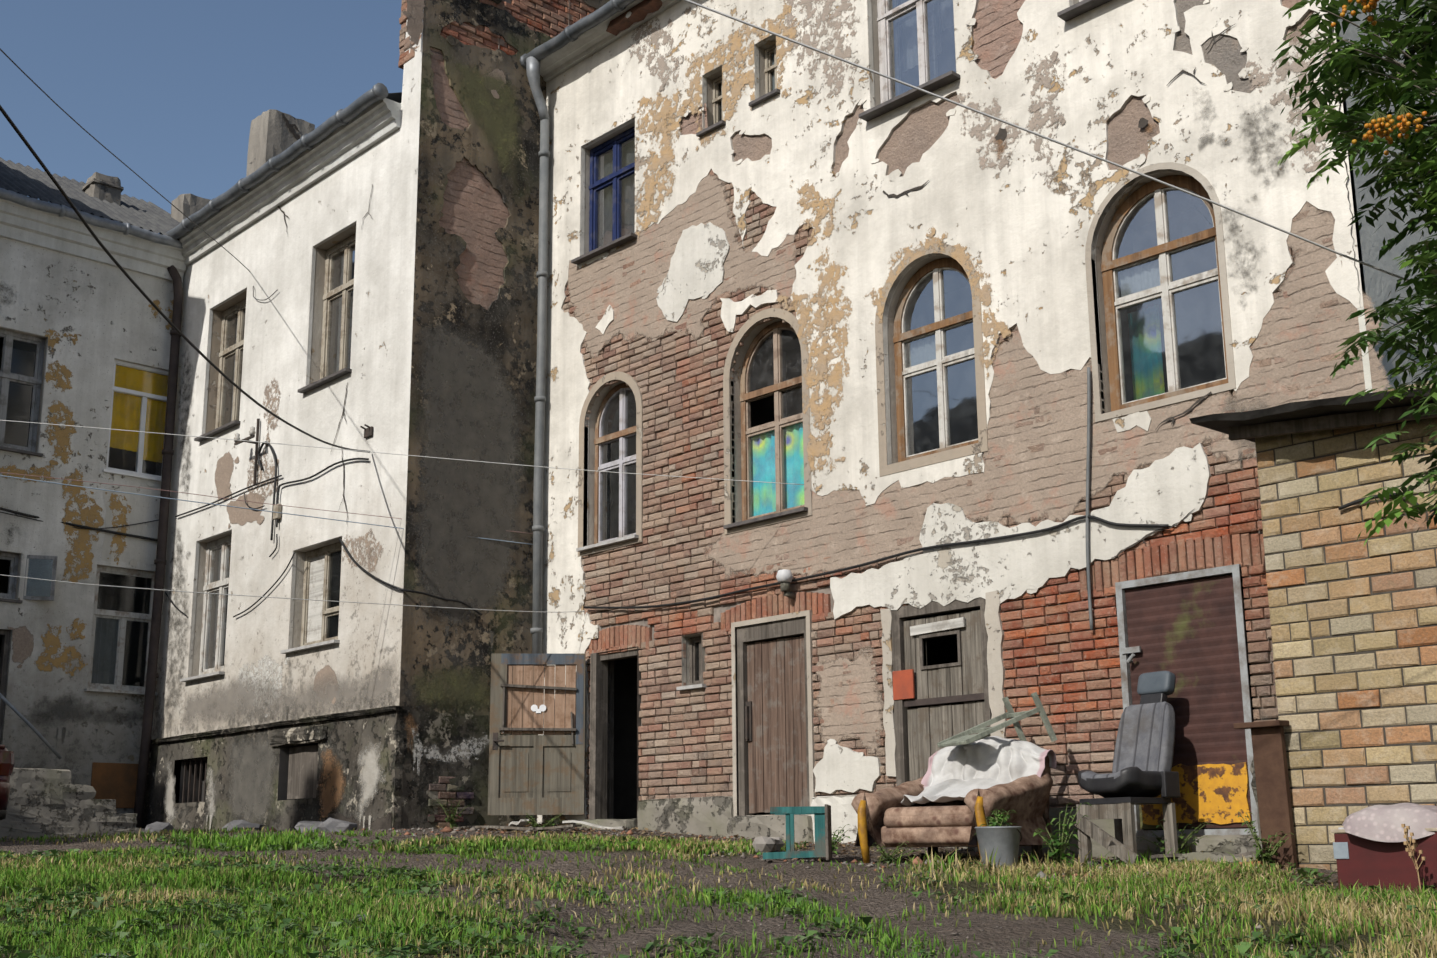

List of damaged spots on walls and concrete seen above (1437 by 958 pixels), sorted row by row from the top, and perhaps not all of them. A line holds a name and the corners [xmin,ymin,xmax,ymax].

damp [459,64,518,176]
spalling [438,158,510,310]
peeling [0,329,132,584]
damp [418,325,523,635]
spalling [562,0,1389,820]
damp [166,531,390,724]
damp [164,774,174,825]
damp [206,737,276,829]
damp [360,747,380,830]
damp [412,730,489,773]